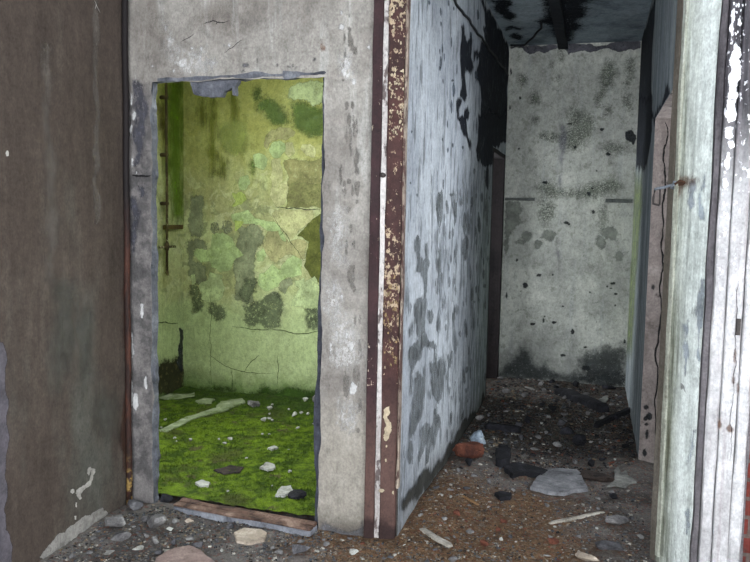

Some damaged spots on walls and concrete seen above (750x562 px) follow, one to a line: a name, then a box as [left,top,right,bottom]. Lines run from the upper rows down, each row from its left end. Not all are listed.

crack [159,321,183,372]
crack [209,299,279,385]
spalling [129,24,362,528]
water stain [237,278,283,329]
crack [232,326,317,334]
water stain [254,88,323,138]
peeling [383,180,490,465]
water stain [456,0,509,190]
water stain [500,0,656,387]
crack [654,122,669,435]
peeling [721,2,744,225]
water stain [401,411,476,510]